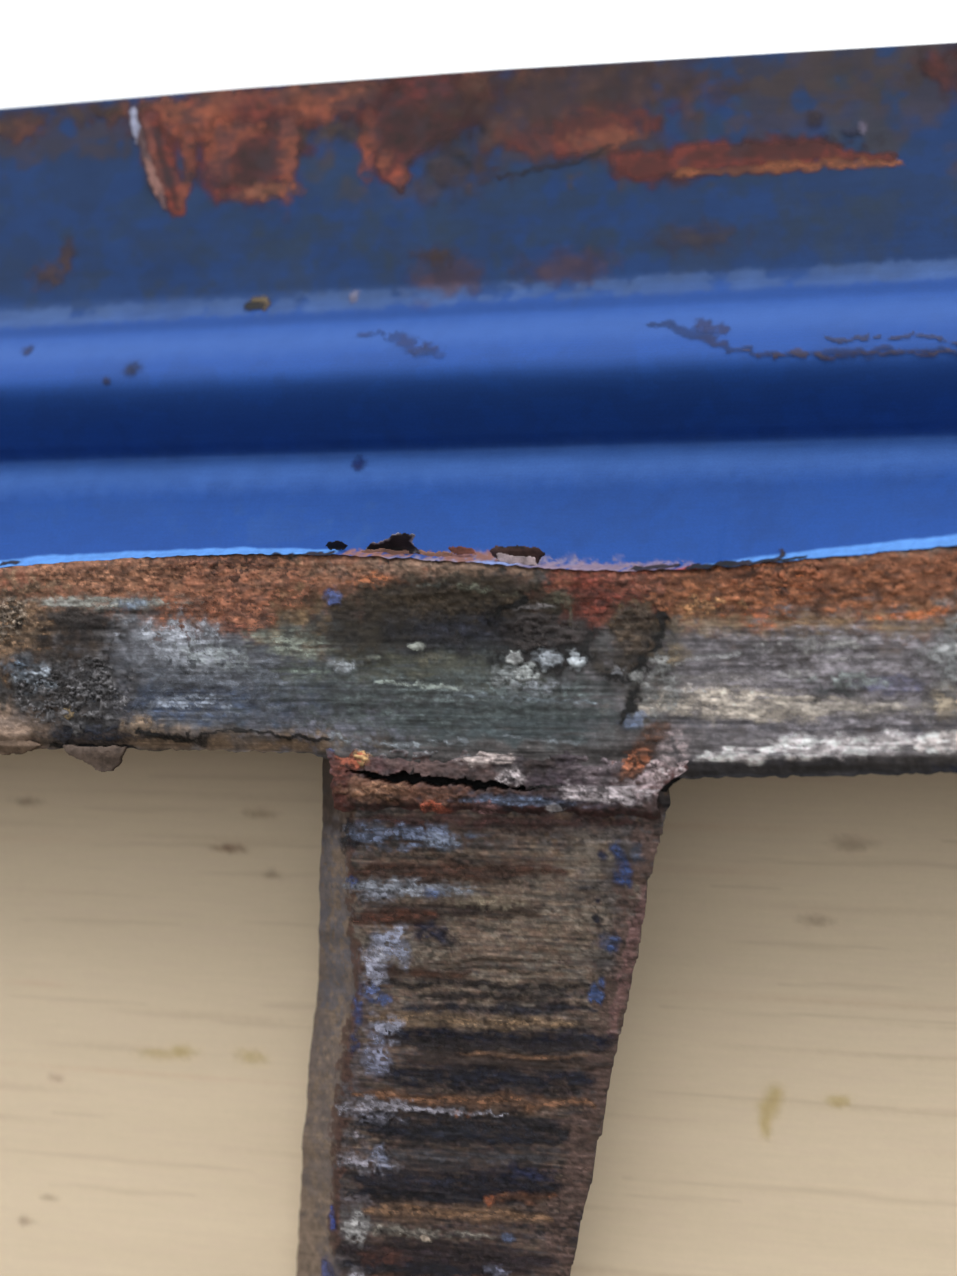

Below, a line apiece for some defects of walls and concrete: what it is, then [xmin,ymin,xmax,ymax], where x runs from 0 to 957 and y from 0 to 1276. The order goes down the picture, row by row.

corrosion [91,64,902,216]
leakage [32,607,124,671]
corrosion [0,554,330,688]
peeling [0,583,655,784]
crack [135,727,564,795]
corrosion [352,569,391,589]
leakage [309,575,556,673]
leakage [627,644,687,727]
peeling [473,624,957,812]
corrosion [566,553,957,631]